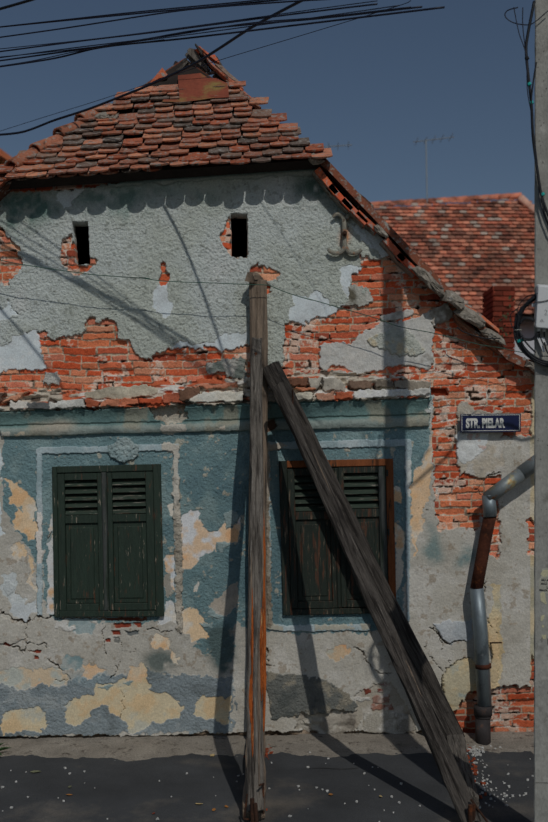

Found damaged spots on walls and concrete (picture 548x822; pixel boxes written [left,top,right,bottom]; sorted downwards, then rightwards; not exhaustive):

spalling [0,228,23,285]
spalling [61,234,97,276]
spalling [220,218,239,259]
spalling [250,264,280,294]
spalling [282,224,534,592]
spalling [0,318,250,664]
corrosion [470,516,497,589]
peeling [0,650,184,739]
peeling [159,695,247,737]
peeling [265,671,423,736]
spalling [453,691,477,733]
spalling [490,658,534,732]